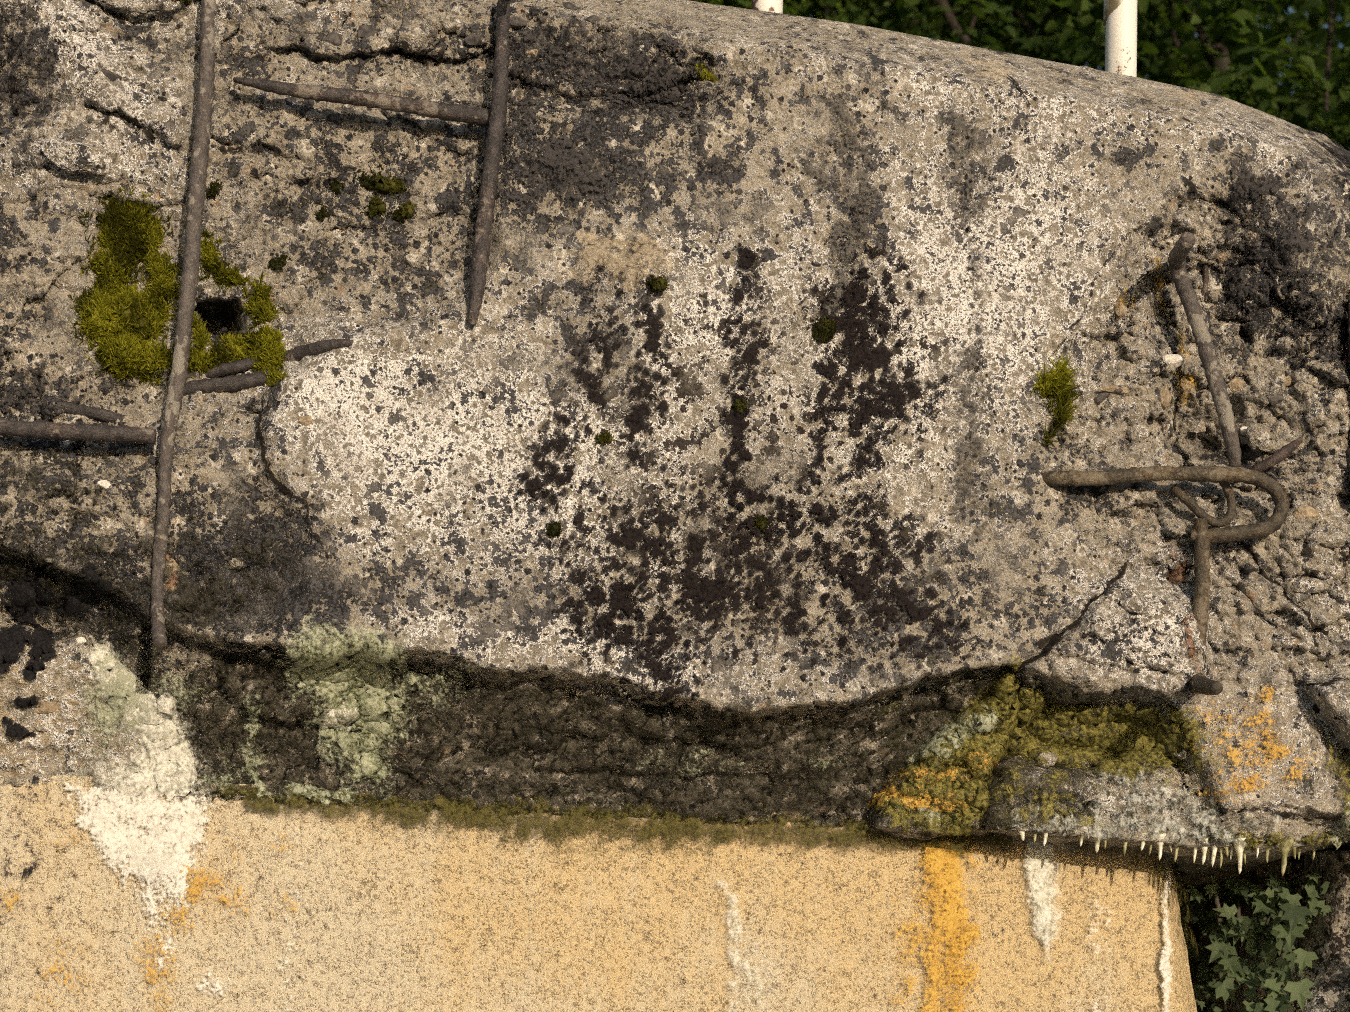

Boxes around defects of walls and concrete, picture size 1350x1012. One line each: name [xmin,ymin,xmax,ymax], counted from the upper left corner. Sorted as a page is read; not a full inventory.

damp [0,0,79,174]
damp [1212,129,1350,372]
spalling [0,0,1005,828]
spalling [1042,188,1350,696]
damp [0,91,1022,987]
crack [1002,562,1128,692]
spalling [992,686,1206,797]
damp [196,968,229,996]
damp [720,882,760,1012]
rust [890,835,982,1012]
damp [978,686,1350,1012]